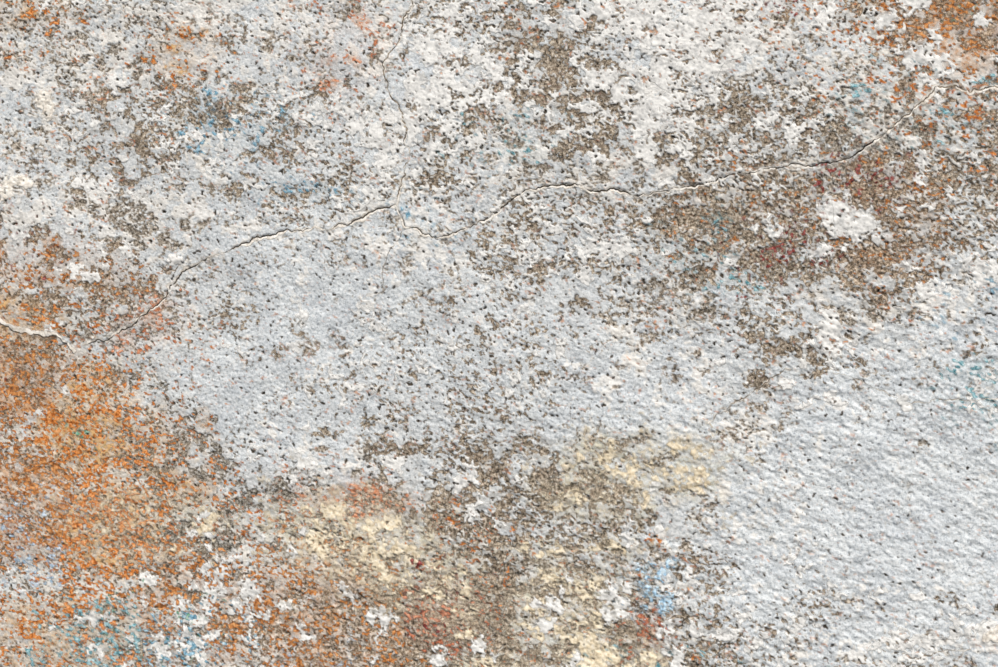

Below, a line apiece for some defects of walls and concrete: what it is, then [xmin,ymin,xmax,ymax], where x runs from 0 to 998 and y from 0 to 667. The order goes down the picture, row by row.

crack [0,0,998,353]
corrosion [866,0,998,86]
corrosion [0,232,491,667]
crack [826,365,998,403]